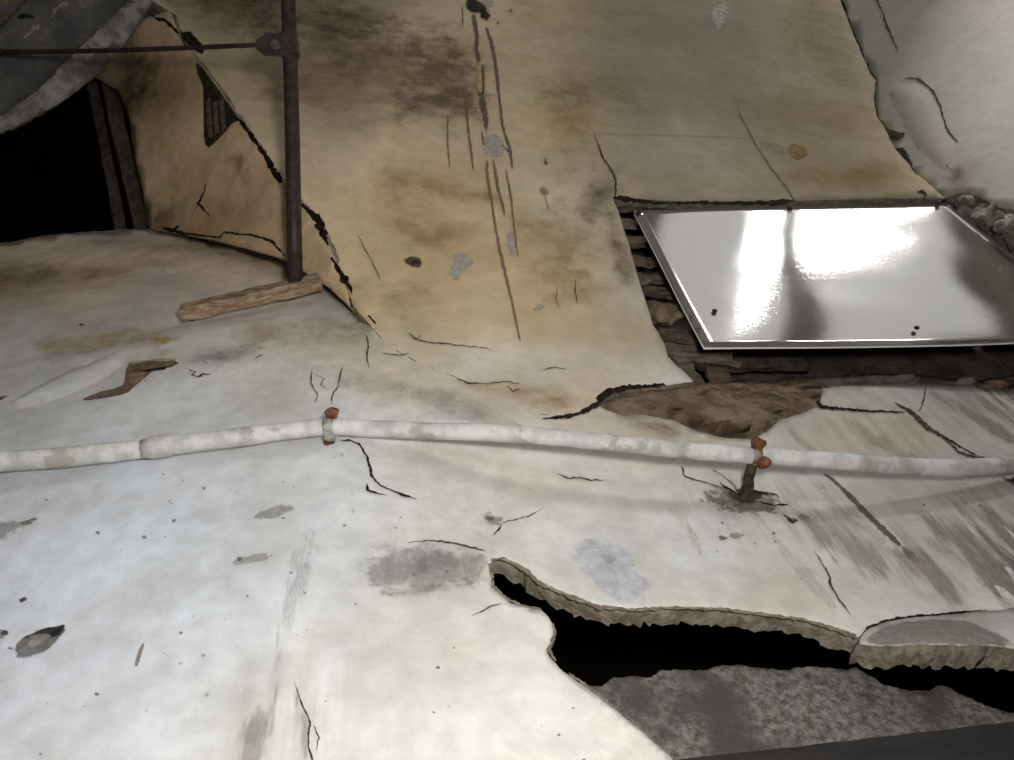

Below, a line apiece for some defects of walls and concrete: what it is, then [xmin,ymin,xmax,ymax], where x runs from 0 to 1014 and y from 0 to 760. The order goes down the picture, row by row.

damp [454,7,521,341]
spalling [952,196,1014,256]
spalling [84,358,178,400]
spalling [599,373,1014,439]
crack [816,385,990,458]
crack [342,439,417,499]
spalling [488,557,1014,757]
crack [294,683,320,760]